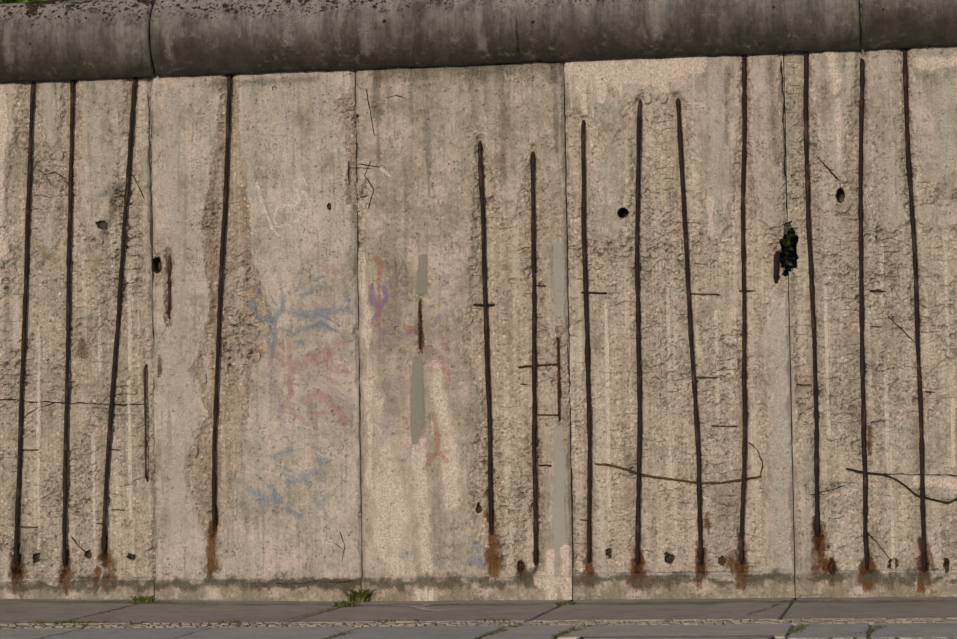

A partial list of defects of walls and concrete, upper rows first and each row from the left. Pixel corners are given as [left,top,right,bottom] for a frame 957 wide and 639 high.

spalling [0,77,176,578]
spalling [182,74,277,538]
spalling [458,33,957,574]
rust [12,545,24,593]
rust [59,549,74,594]
rust [92,536,116,591]
rust [204,507,219,577]
rust [484,493,502,577]
rust [629,544,646,588]
rust [695,513,711,588]
rust [811,517,838,585]
rust [858,552,877,592]